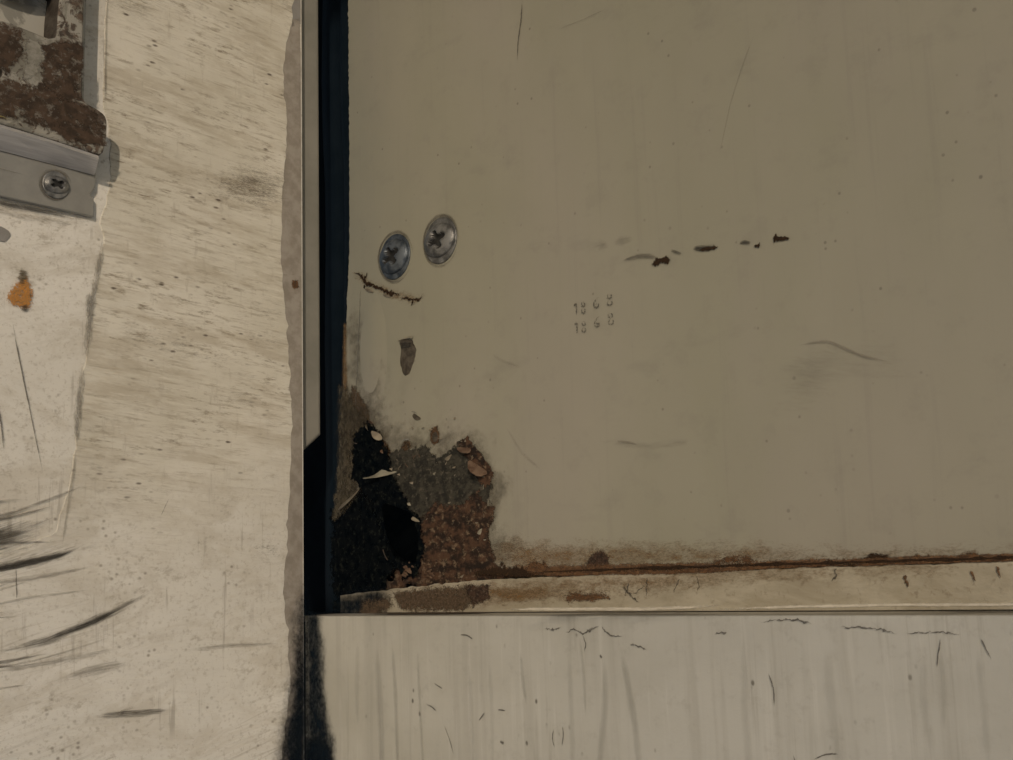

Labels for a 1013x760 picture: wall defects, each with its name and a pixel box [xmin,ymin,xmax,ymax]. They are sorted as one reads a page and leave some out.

rust [0,22,107,147]
rust [6,270,33,311]
peeling [398,336,416,376]
rust [332,325,370,520]
peeling [338,411,456,510]
rust [360,436,1013,614]